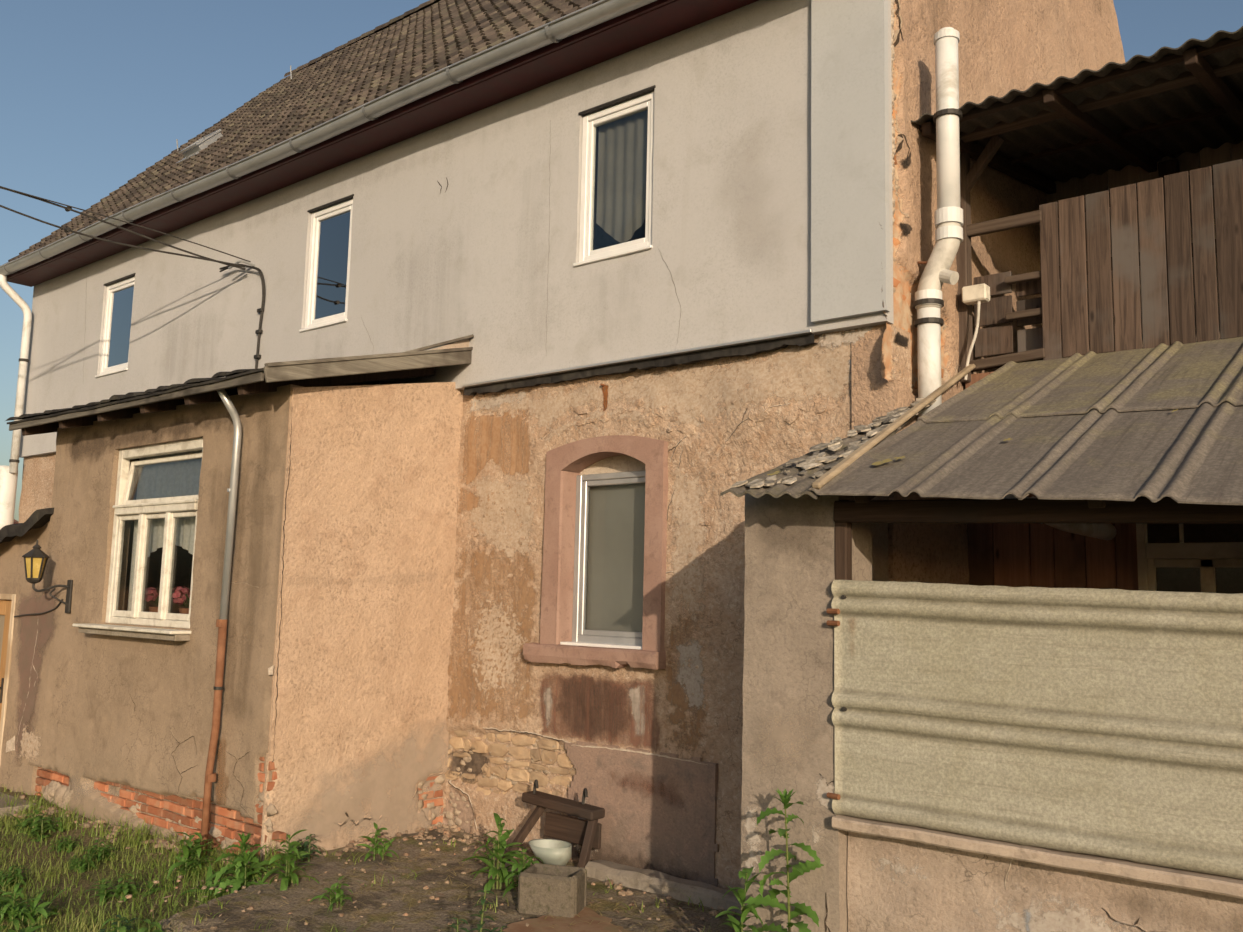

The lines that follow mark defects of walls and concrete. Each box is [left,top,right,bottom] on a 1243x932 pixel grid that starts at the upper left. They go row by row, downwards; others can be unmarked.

flaking render [447,0,919,754]
spalling [940,314,960,393]
crack [170,412,292,818]
damp [541,675,660,748]
flaking render [94,757,286,856]
flaking render [417,774,446,829]
crack [1102,906,1172,932]